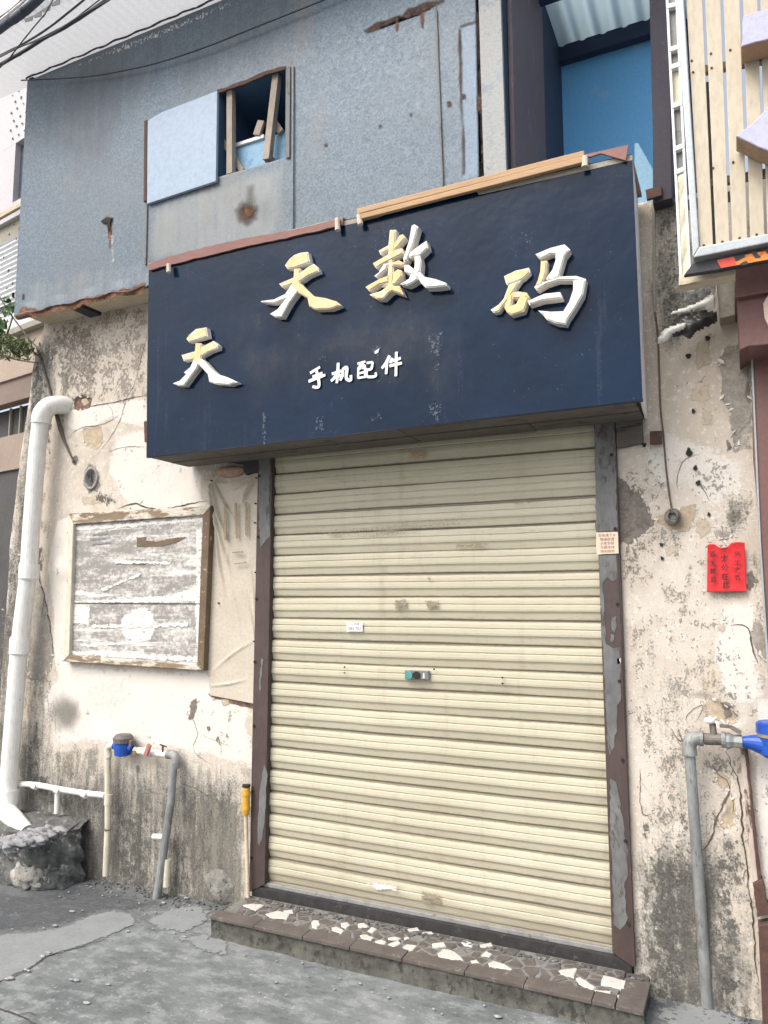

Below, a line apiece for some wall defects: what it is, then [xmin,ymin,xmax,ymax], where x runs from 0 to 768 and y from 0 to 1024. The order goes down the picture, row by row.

corrosion [101,217,113,247]
corrosion [238,188,256,224]
peeling [44,322,102,412]
peeling [594,423,731,754]
peeling [746,571,758,596]
flaking render [704,692,738,724]
water stain [25,735,98,836]
water stain [0,766,157,929]
water stain [190,778,244,907]
peeling [609,779,629,930]
water stain [637,813,759,1017]
crack [703,752,759,982]